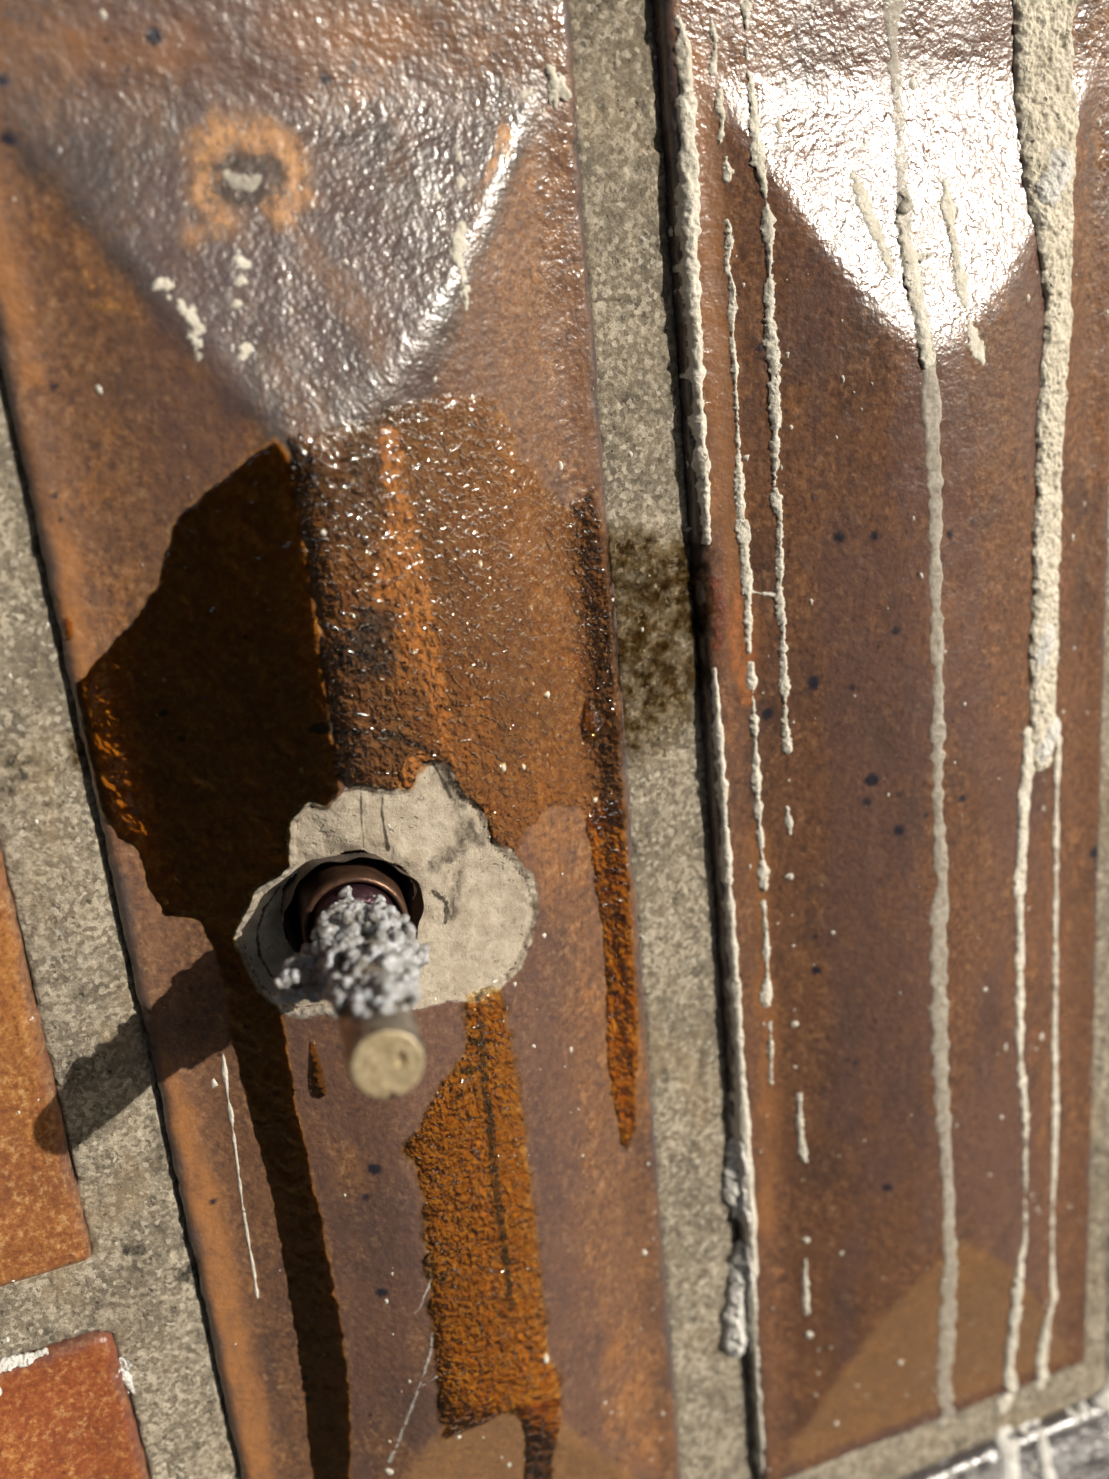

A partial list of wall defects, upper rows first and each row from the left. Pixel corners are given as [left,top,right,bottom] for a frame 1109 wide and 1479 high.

corrosion [193,118,313,232]
water stain [668,17,711,545]
water stain [1012,0,1082,772]
corrosion [309,618,339,637]
corrosion [371,425,458,790]
water stain [609,540,709,728]
water stain [884,0,958,1429]
spalling [232,759,539,1018]
water stain [692,667,765,1474]
water stain [994,1419,1057,1479]
water stain [1100,1252,1109,1403]